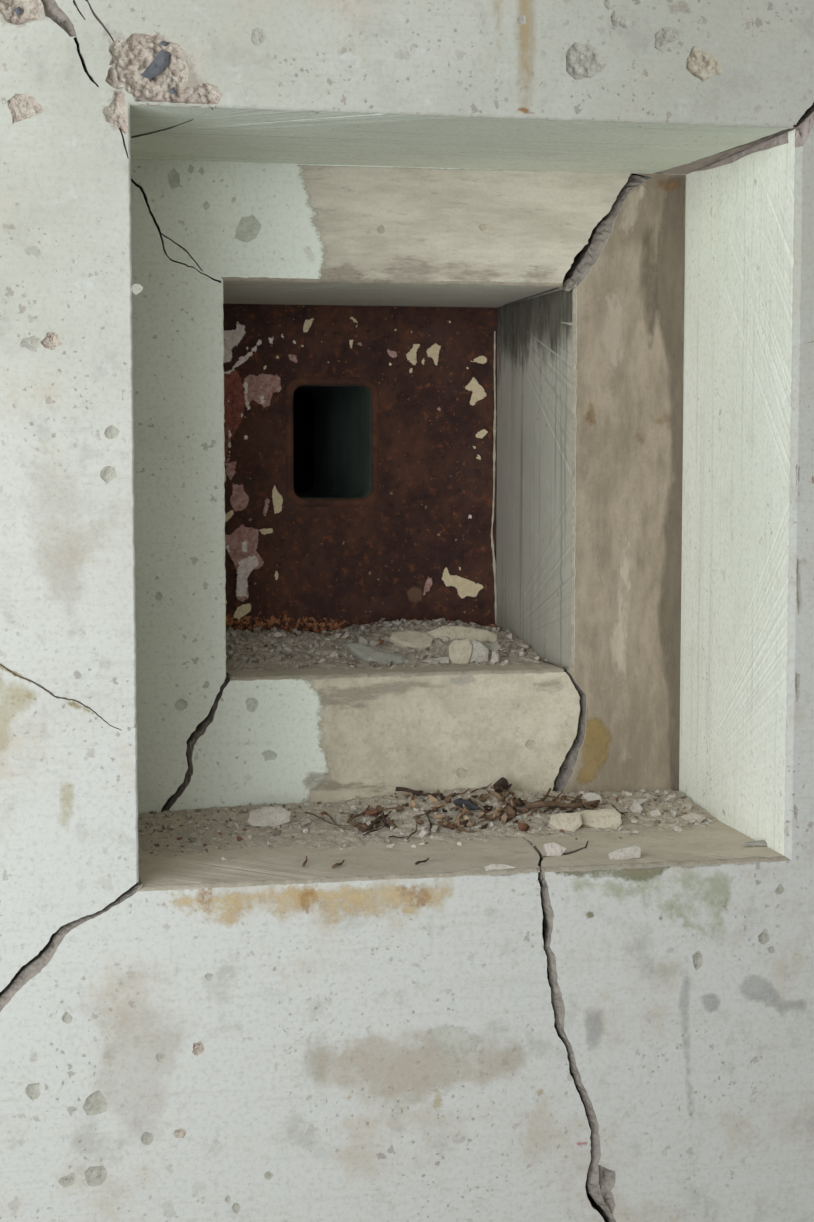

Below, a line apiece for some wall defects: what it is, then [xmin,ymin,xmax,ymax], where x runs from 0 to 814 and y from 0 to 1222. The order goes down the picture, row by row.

spalling [0,0,76,37]
crack [73,0,114,87]
spalling [103,33,223,134]
crack [119,119,221,283]
crack [503,103,814,306]
peeling [223,318,314,620]
corrosion [226,611,358,632]
crack [0,664,122,731]
crack [161,671,233,812]
crack [539,659,586,792]
crack [0,878,143,1012]
crack [506,838,616,1222]